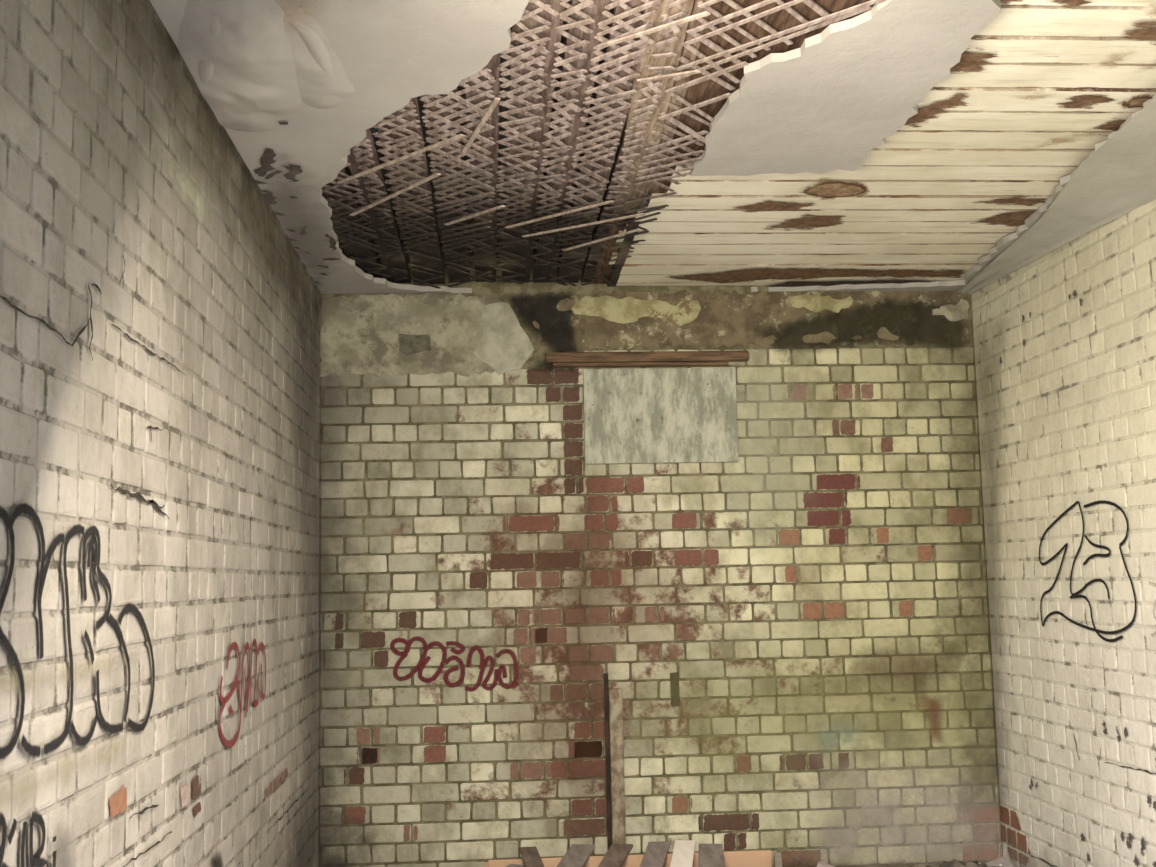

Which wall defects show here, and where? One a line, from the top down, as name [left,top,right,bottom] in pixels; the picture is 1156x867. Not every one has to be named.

peeling [1046,0,1092,9]
peeling [1122,11,1156,45]
peeling [951,48,998,74]
peeling [905,93,969,128]
peeling [1041,94,1153,147]
leakage [103,0,318,314]
peeling [733,179,869,231]
peeling [970,196,1047,226]
crack [0,256,186,375]
leakage [763,301,962,350]
flaking render [999,806,1031,867]
spalling [1120,832,1156,867]